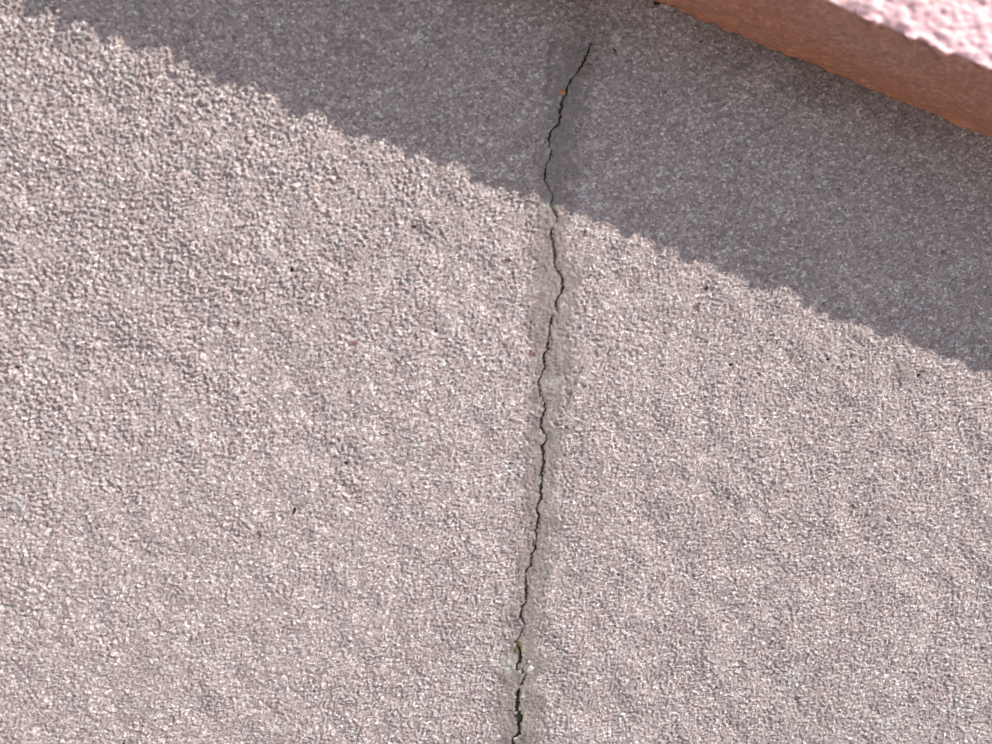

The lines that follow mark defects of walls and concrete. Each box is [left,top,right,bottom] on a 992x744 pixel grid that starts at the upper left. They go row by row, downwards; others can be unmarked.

crack [512,38,593,744]